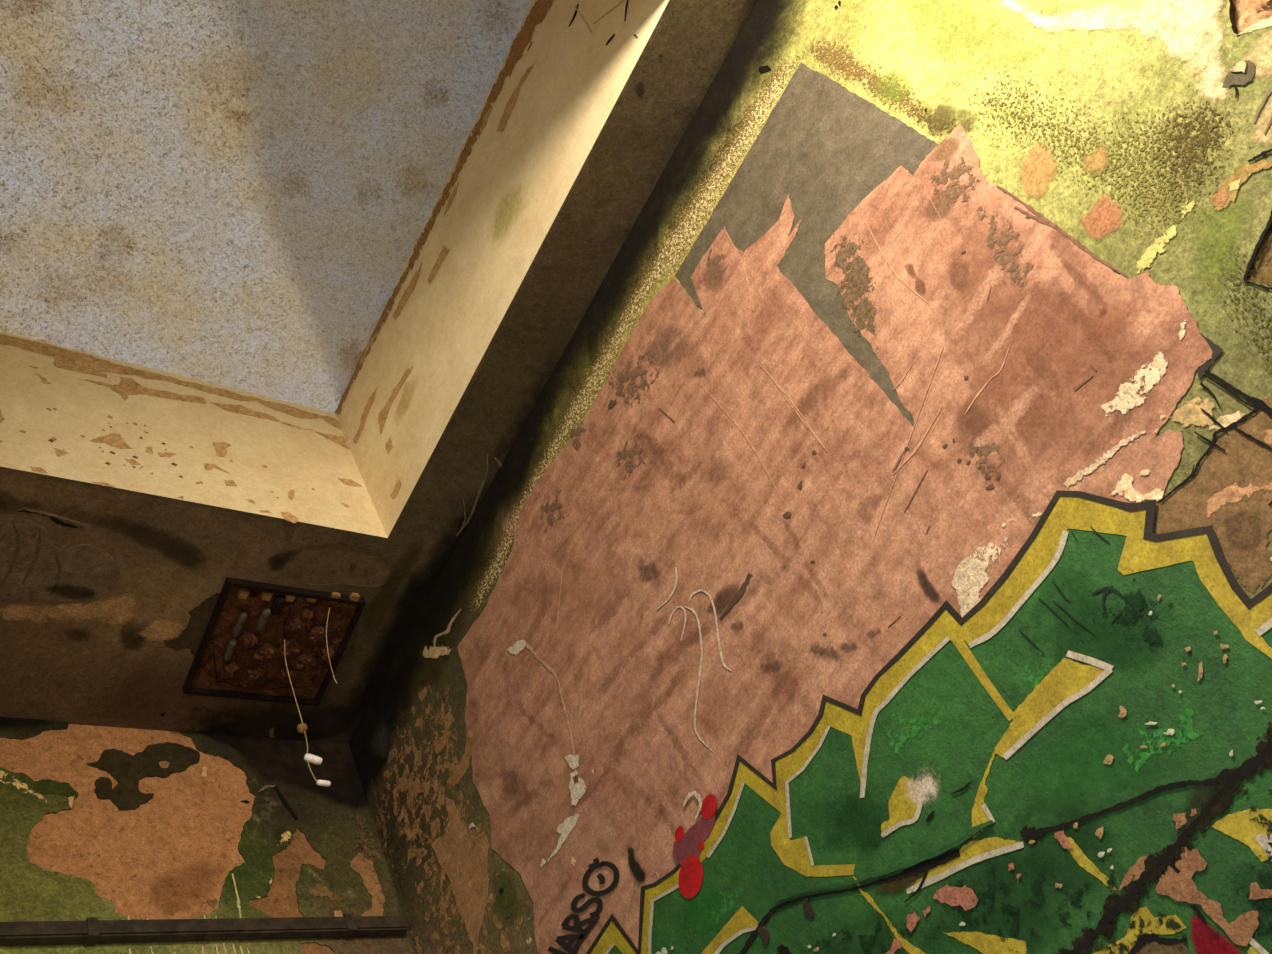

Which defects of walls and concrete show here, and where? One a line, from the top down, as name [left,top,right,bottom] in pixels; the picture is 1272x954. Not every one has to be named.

spalling [1229,0,1272,37]
spalling [1222,60,1255,98]
peeling [0,0,555,454]
peeling [1211,149,1272,211]
leakage [355,0,1272,718]
peeling [1102,352,1168,416]
spalling [1064,393,1272,593]
leakage [0,594,139,625]
leakage [140,619,184,641]
peeling [952,519,1013,617]
peeling [0,724,256,920]
crack [739,721,1272,954]